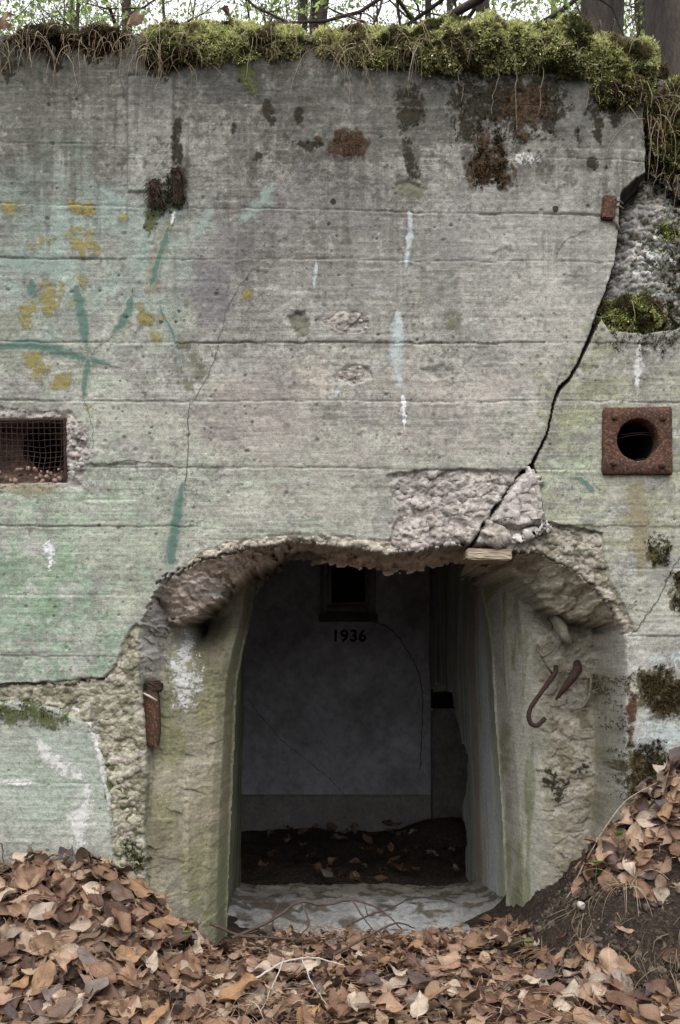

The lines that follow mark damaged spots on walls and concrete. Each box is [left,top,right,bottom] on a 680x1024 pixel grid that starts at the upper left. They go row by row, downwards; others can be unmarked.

damp [0,44,23,83]
damp [47,50,70,73]
damp [171,118,184,169]
damp [432,71,622,190]
damp [404,210,414,274]
spalling [602,138,680,335]
damp [389,311,407,430]
crack [464,173,645,551]
spalling [173,470,521,577]
spalling [513,524,634,635]
spalling [0,625,151,882]